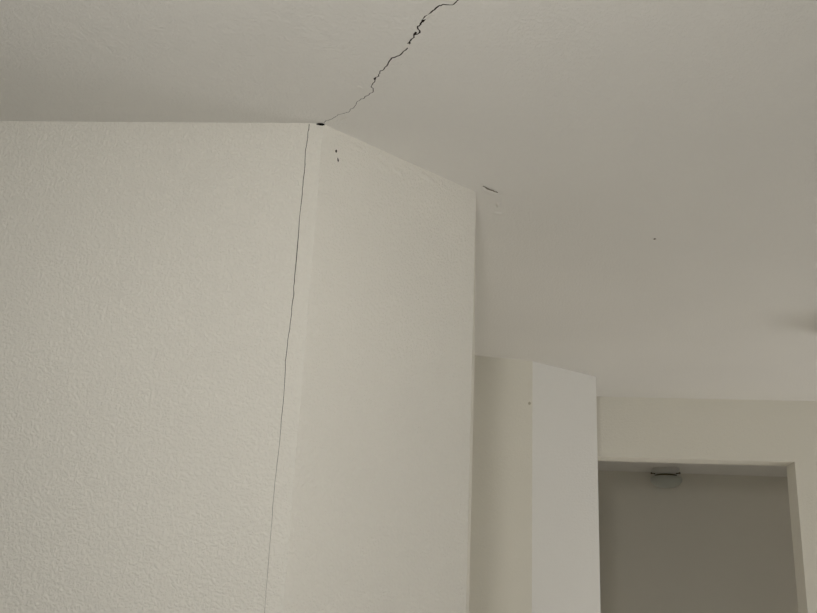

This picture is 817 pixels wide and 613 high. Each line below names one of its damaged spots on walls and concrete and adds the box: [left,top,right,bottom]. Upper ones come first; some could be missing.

crack [264,0,458,613]